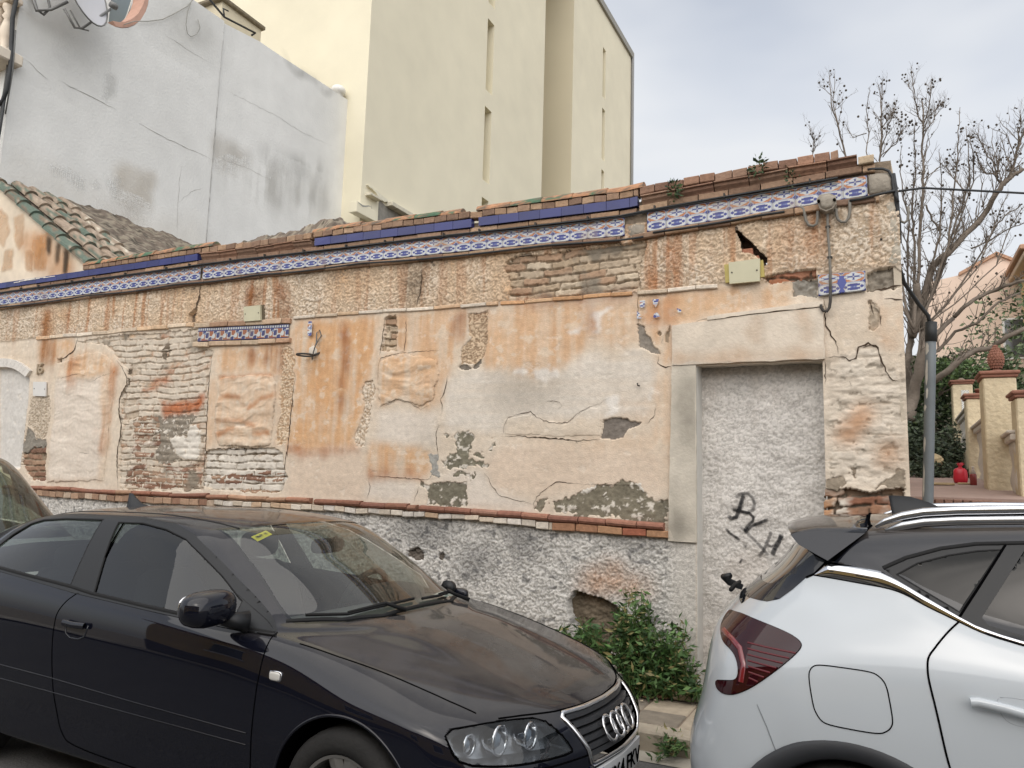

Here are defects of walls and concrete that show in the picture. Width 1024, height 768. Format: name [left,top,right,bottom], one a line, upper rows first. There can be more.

flaking render [504,243,647,301]
flaking render [459,311,488,370]
flaking render [638,324,671,354]
crack [824,285,902,384]
flaking render [23,396,51,481]
flaking render [82,313,296,493]
crack [503,399,606,441]
flaking render [601,418,641,440]
flaking render [420,431,496,507]
peeling [534,480,669,523]
flaking render [824,469,905,515]
flaking render [572,591,622,653]